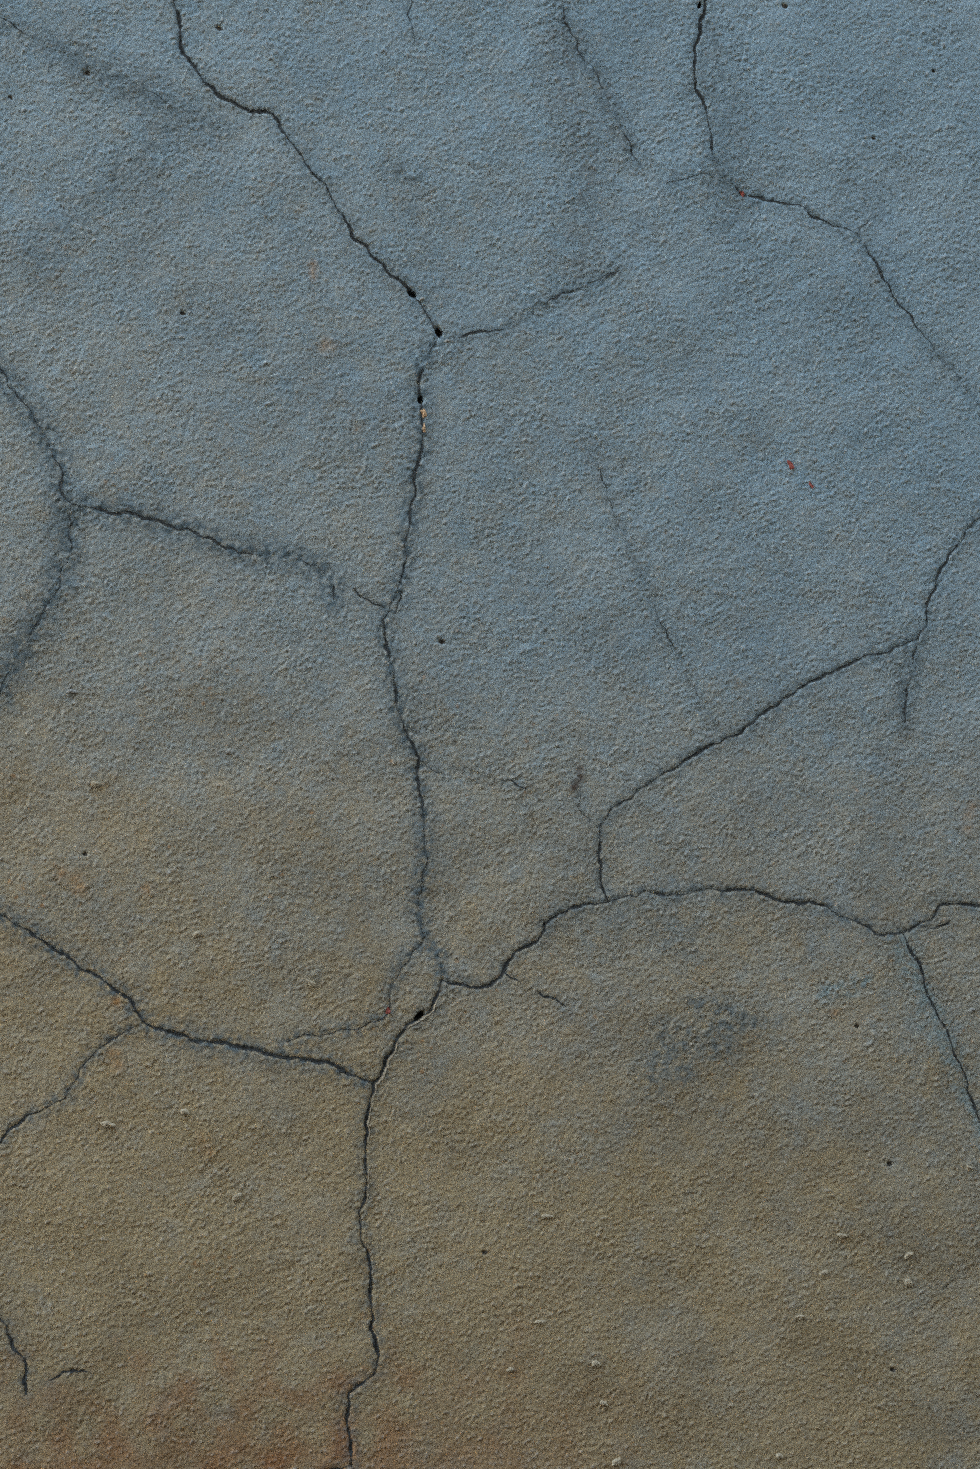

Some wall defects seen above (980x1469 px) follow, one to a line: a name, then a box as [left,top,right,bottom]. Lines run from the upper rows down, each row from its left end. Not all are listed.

crack [0,367,262,640]
crack [173,0,440,1042]
crack [461,329,503,337]
crack [545,270,619,304]
crack [563,0,960,380]
crack [0,517,980,1469]